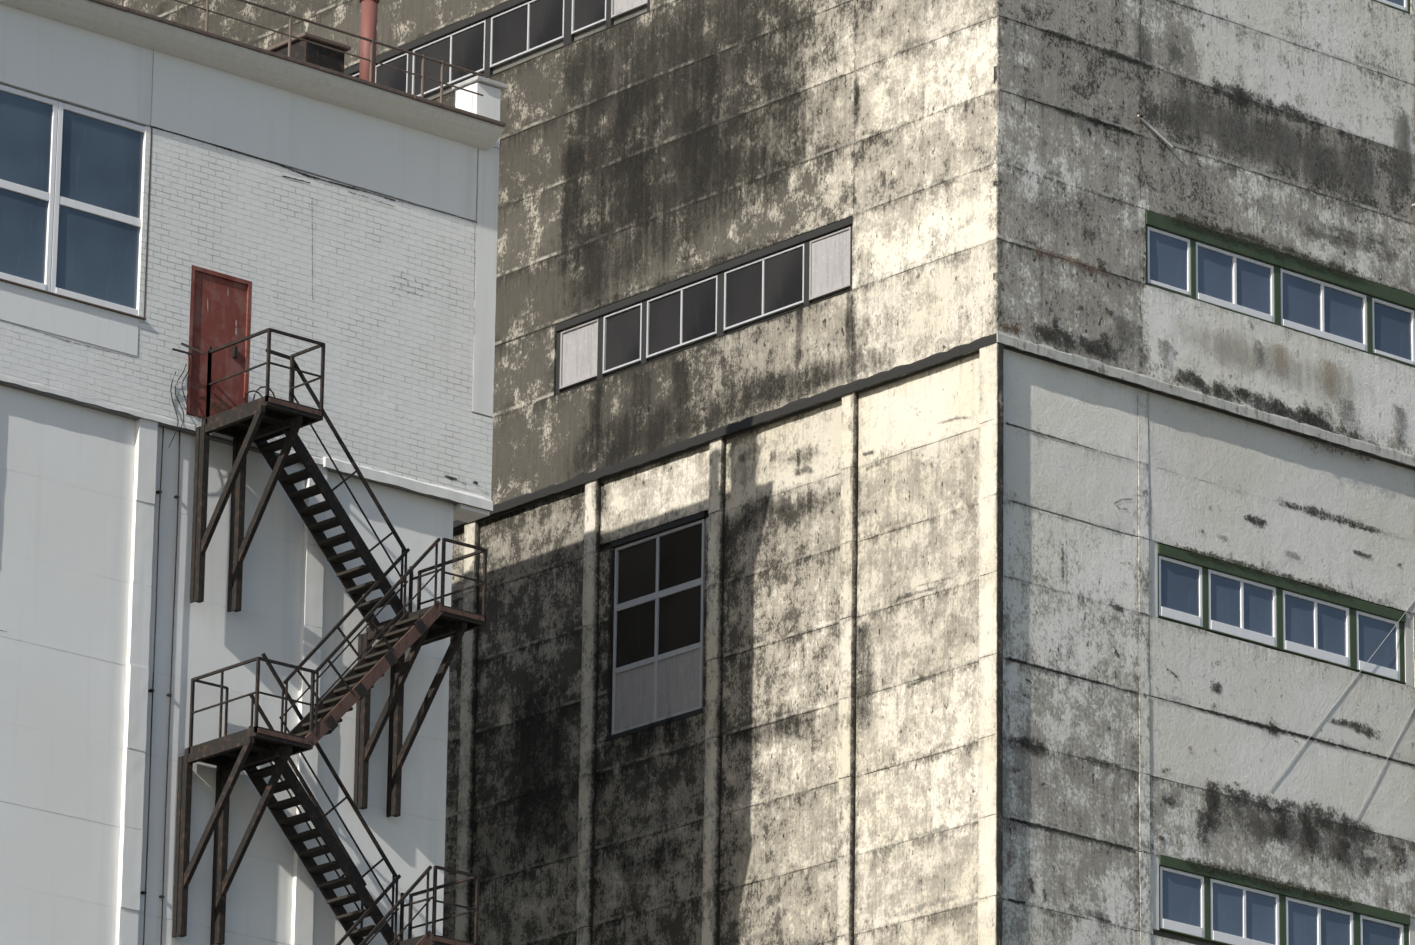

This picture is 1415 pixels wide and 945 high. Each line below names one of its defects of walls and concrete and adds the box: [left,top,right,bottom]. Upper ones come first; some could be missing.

water stain [551,0,813,314]
water stain [1169,76,1372,198]
water stain [1031,308,1136,363]
water stain [574,295,894,475]
water stain [1158,333,1377,462]
water stain [1393,404,1407,447]
water stain [745,491,811,531]
water stain [855,625,872,718]
water stain [739,710,813,743]
water stain [1328,718,1381,740]
water stain [1178,778,1409,906]